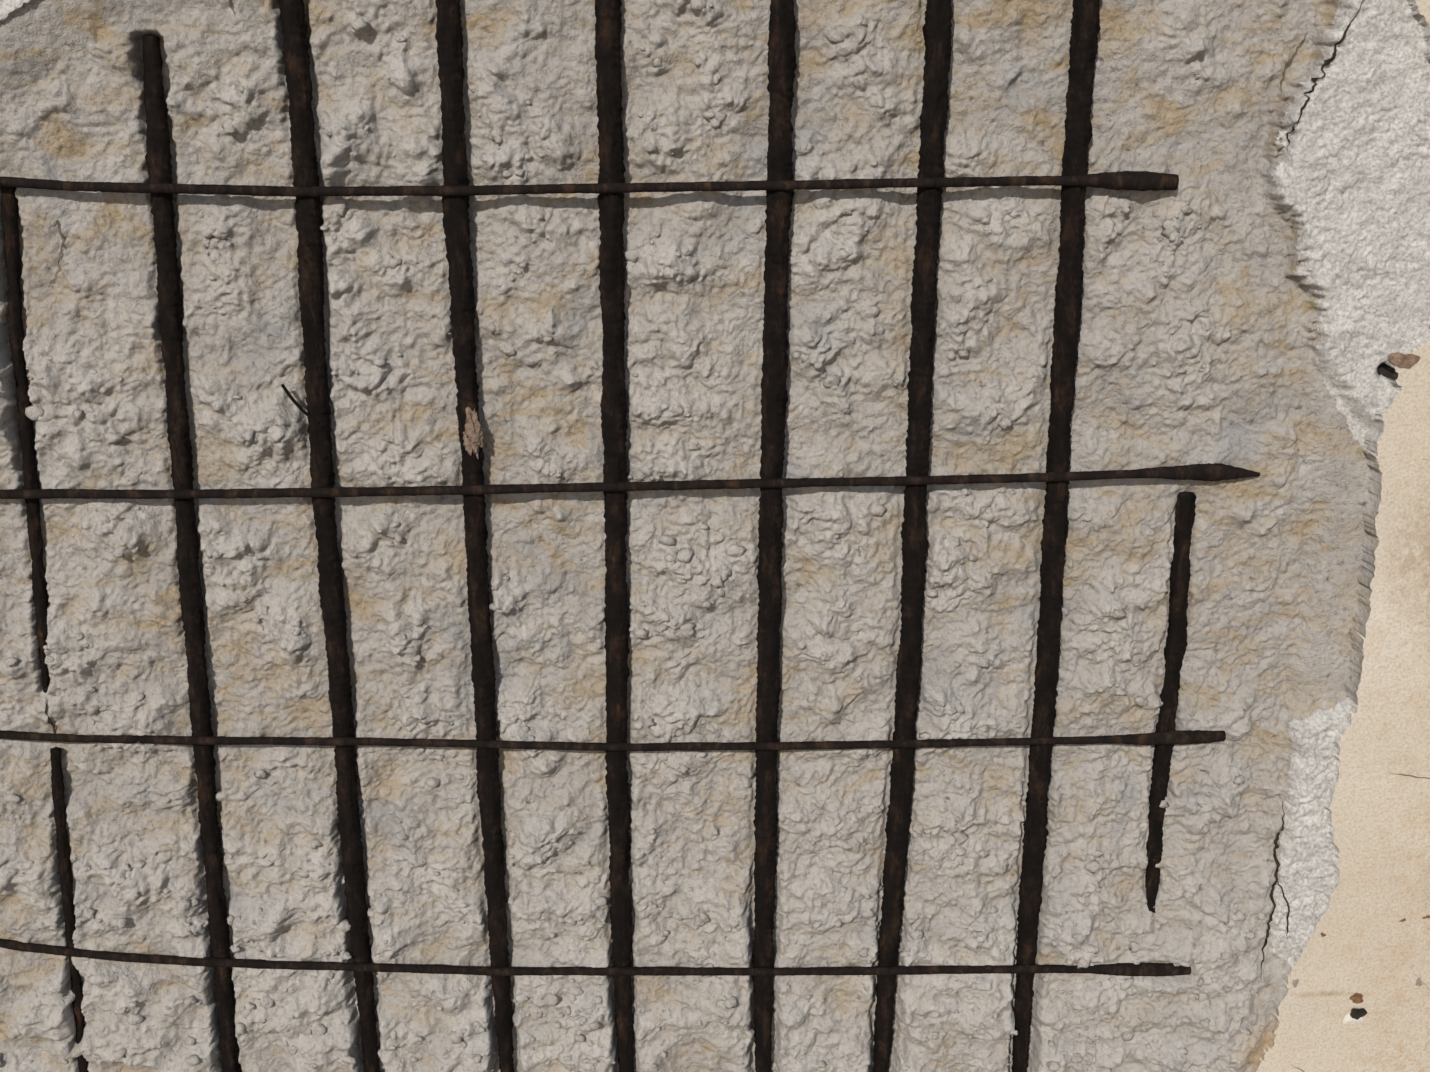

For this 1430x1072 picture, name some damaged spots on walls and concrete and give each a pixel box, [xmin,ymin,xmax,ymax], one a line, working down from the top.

crack [1280,0,1364,150]
rust [463,407,484,459]
spalling [0,0,771,1072]
spalling [771,0,1430,1072]
crack [1260,801,1290,980]